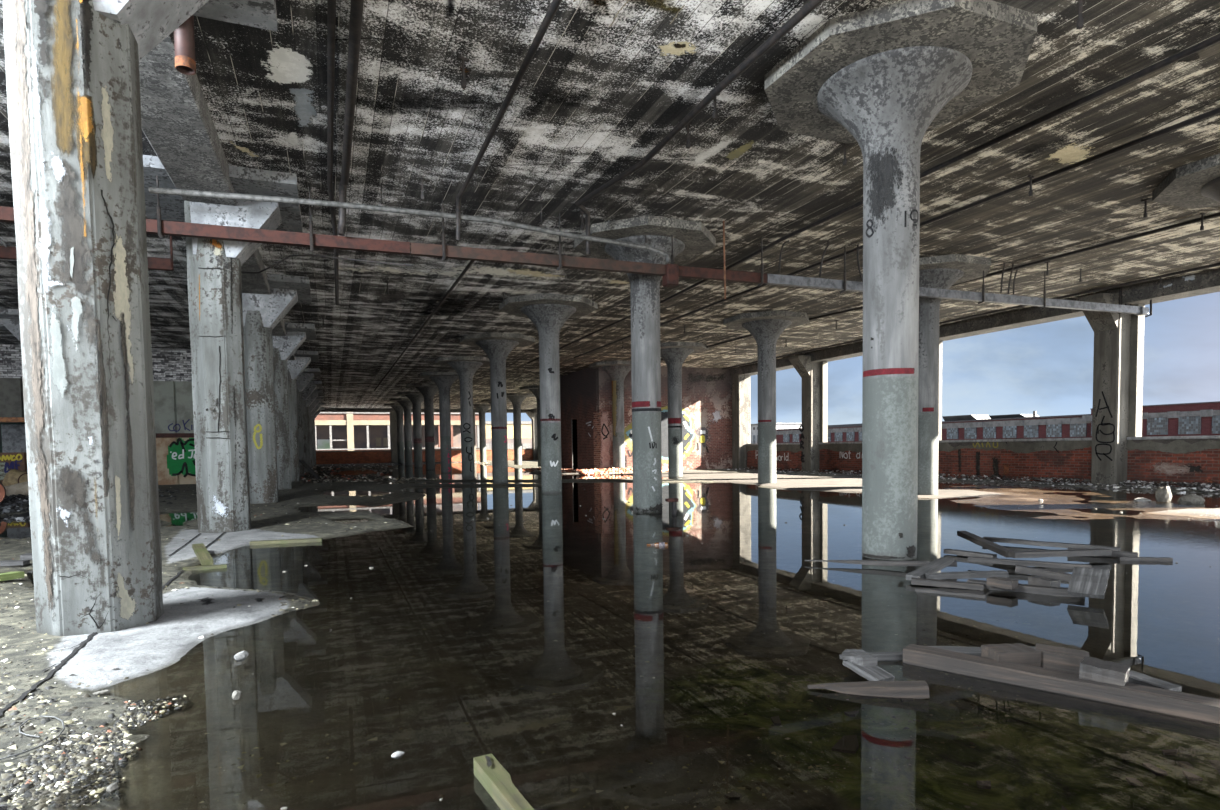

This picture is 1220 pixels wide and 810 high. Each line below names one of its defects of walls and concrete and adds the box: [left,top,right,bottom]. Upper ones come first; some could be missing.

damp [573,0,685,27]
peeling [101,85,114,183]
peeling [261,44,317,146]
damp [689,138,754,164]
peeling [48,161,100,399]
rust [209,239,223,256]
peeling [112,233,135,540]
damp [56,321,110,565]
damp [212,495,229,518]
peeling [116,572,136,620]